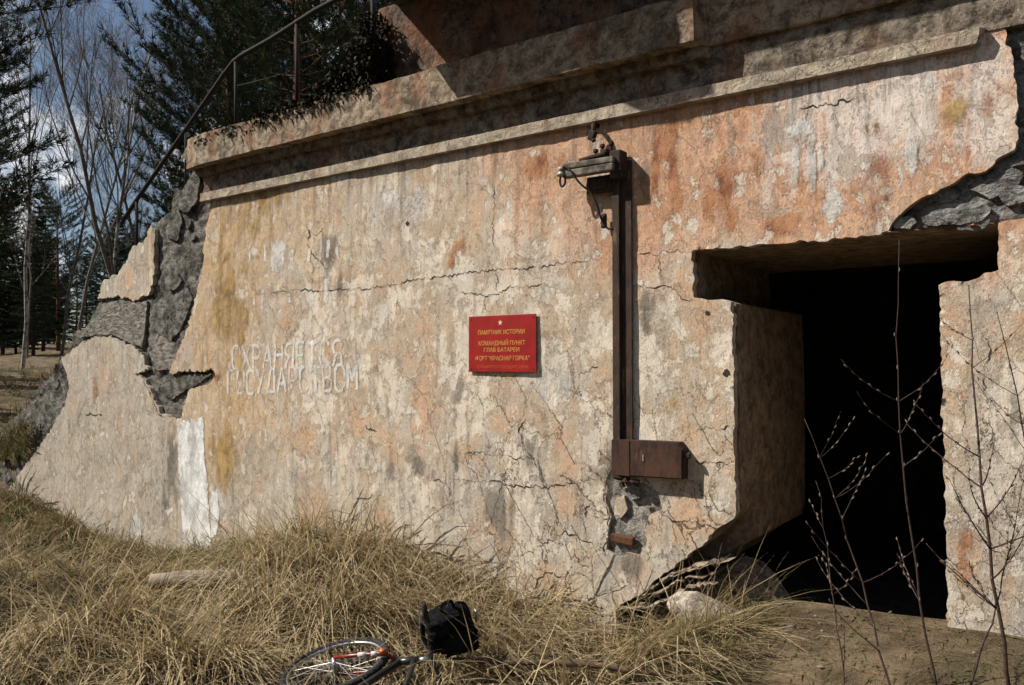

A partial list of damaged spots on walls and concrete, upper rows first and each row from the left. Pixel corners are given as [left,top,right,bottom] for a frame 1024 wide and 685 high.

crack [800,98,854,121]
spalling [892,28,1024,232]
crack [256,186,596,312]
spalling [0,171,216,487]
crack [433,418,611,595]
spalling [607,472,662,556]
crack [660,461,733,537]